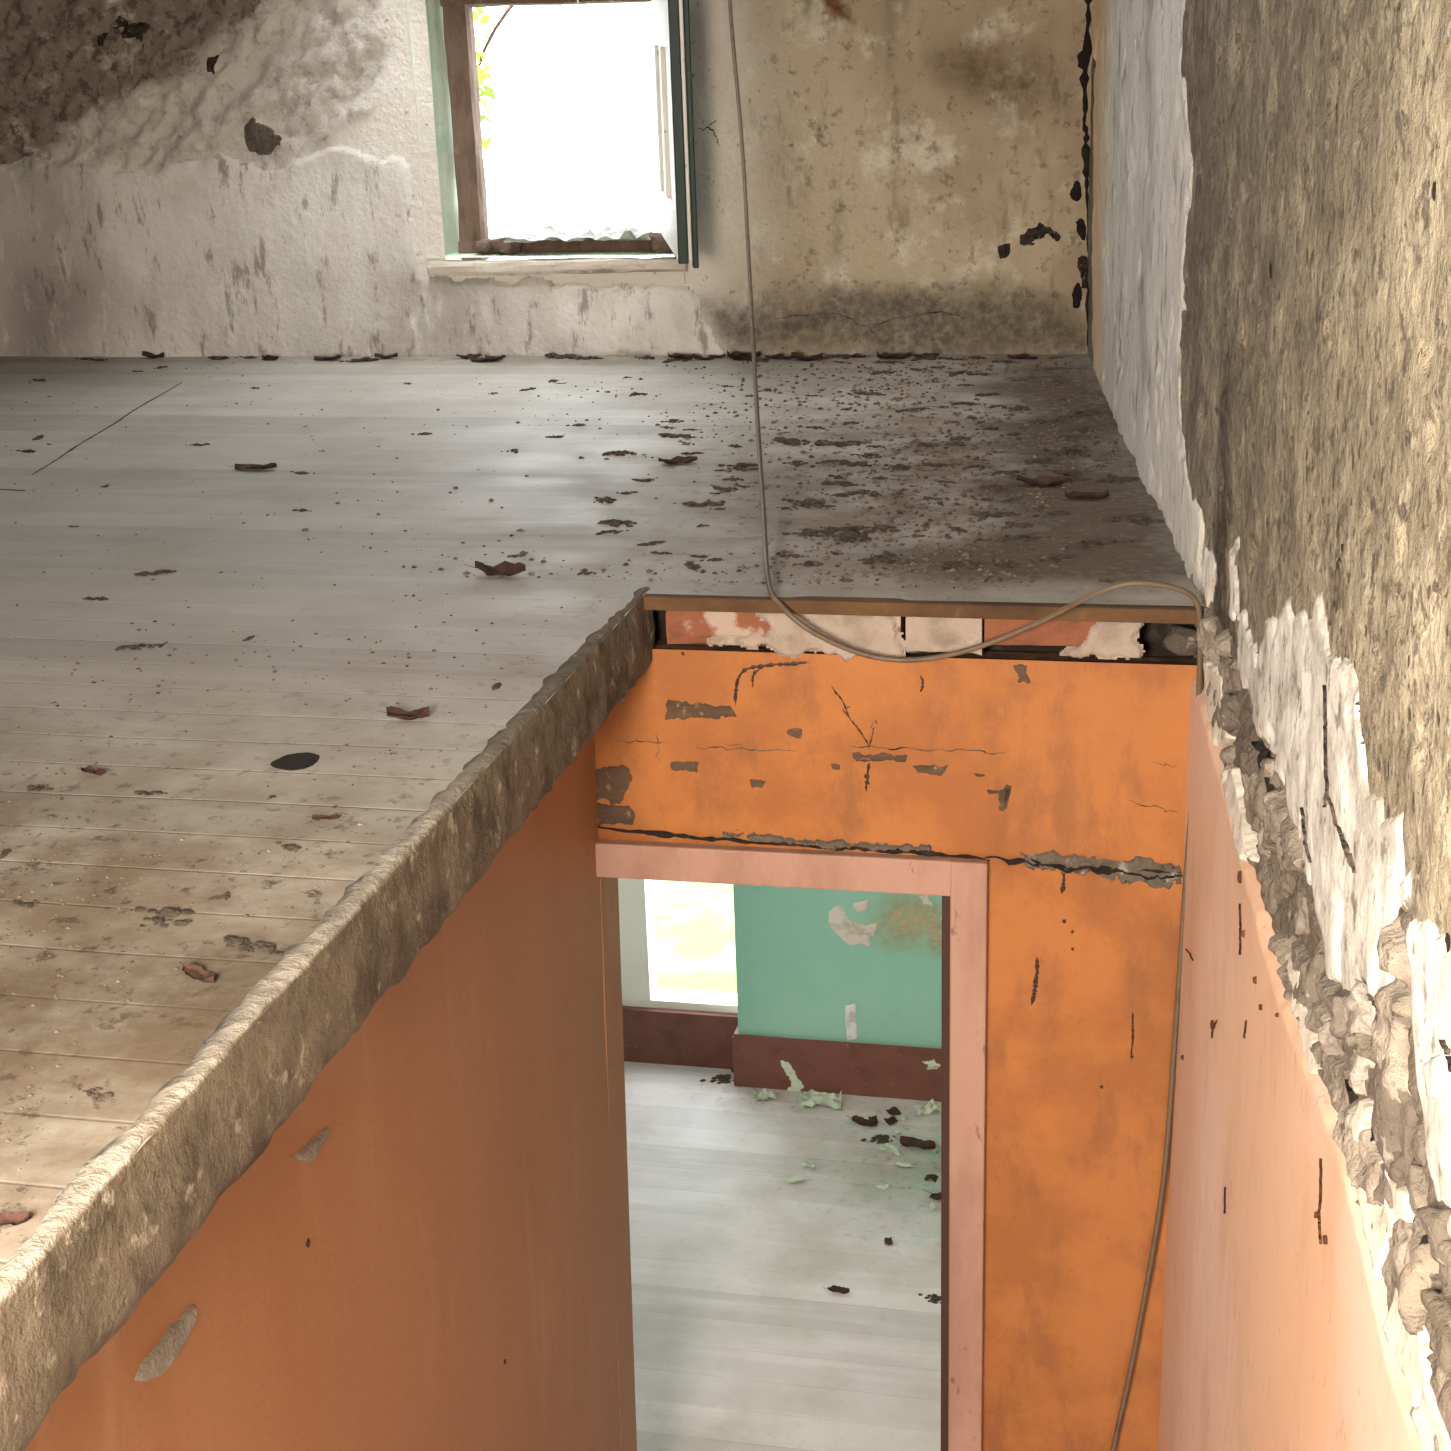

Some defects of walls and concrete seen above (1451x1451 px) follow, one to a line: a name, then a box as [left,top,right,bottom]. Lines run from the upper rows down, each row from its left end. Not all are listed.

peeling [0,117,727,357]
spalling [998,222,1061,259]
damp [718,292,1084,354]
peeling [665,700,737,720]
peeling [596,764,635,826]
peeling [831,752,948,776]
crack [1300,685,1356,873]
peeling [722,829,932,852]
crack [597,826,1181,875]
spalling [1020,850,1183,889]
peeling [829,900,878,947]
crack [1439,1040,1451,1072]